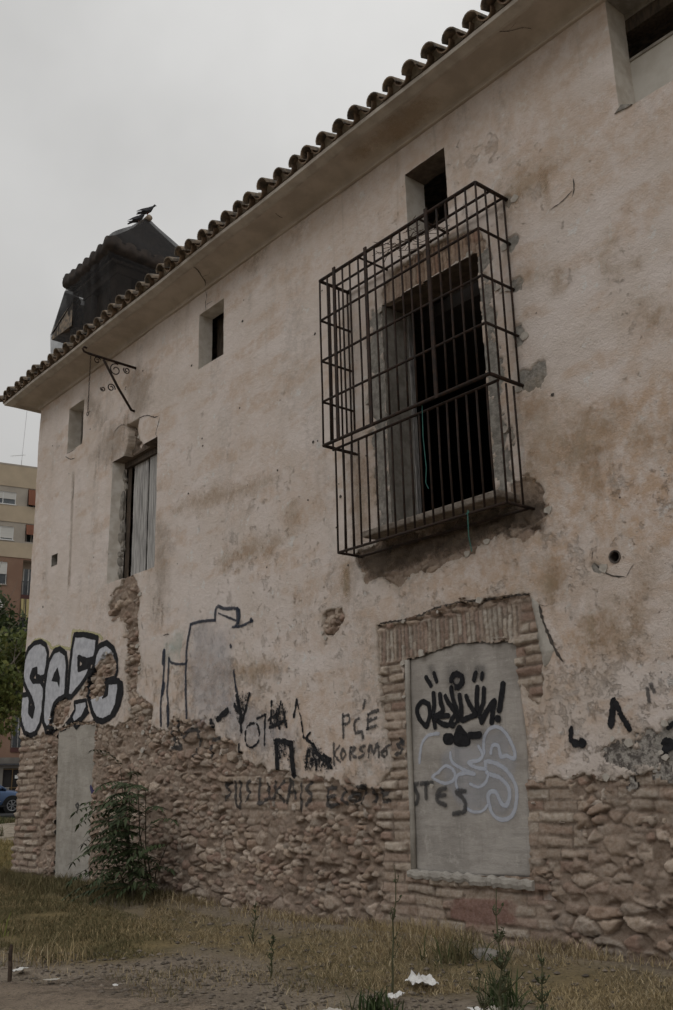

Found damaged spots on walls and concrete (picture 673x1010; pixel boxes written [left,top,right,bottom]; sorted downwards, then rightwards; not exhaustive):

spalling [347,231,554,587]
spalling [11,470,673,968]